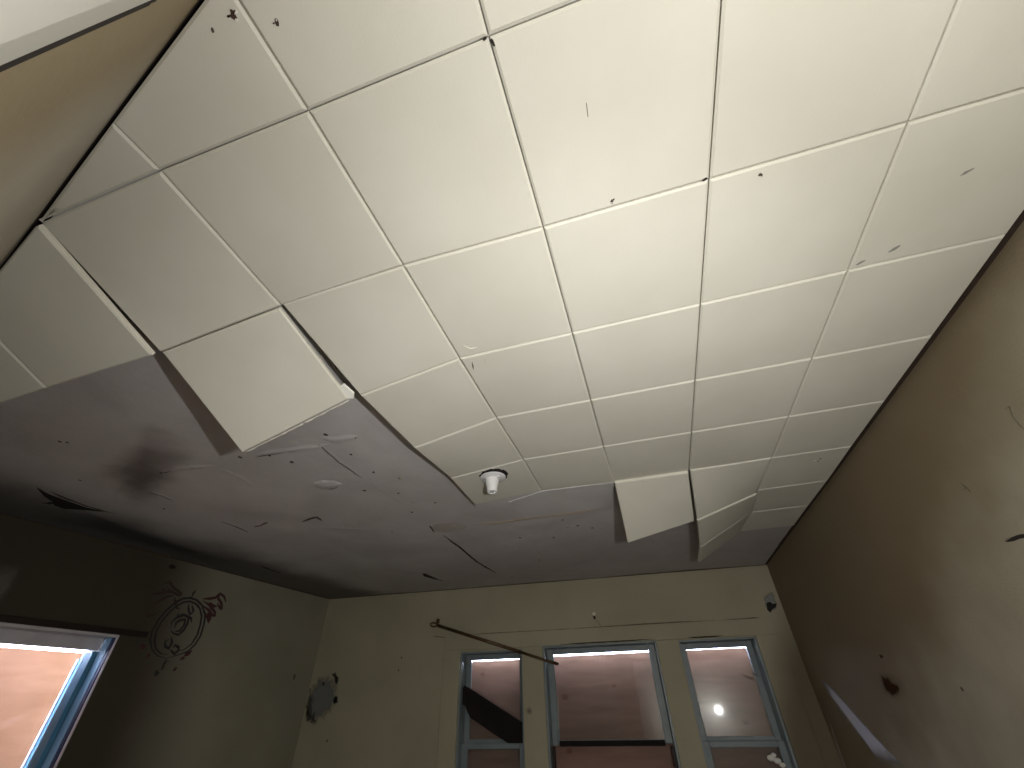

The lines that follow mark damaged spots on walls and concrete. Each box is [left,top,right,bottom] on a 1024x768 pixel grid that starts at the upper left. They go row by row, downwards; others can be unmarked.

crack [429,526,496,573]
spalling [306,673,338,723]